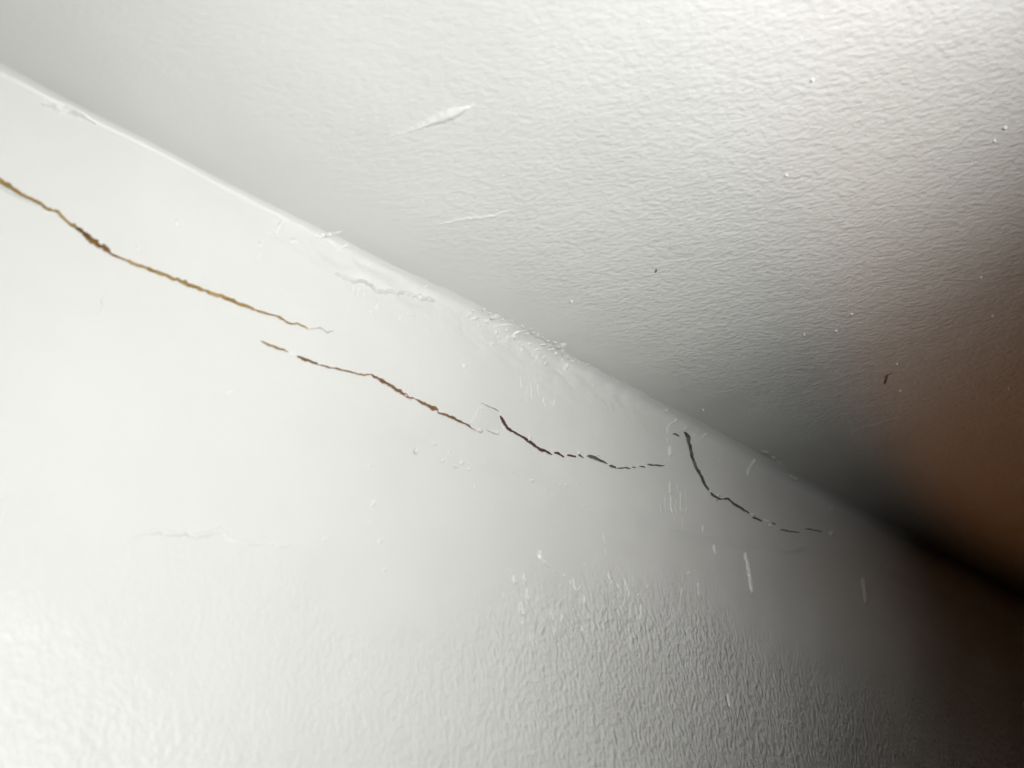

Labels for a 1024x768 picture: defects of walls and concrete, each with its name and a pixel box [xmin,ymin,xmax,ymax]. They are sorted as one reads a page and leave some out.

crack [0,178,331,333]
crack [261,341,665,469]
crack [673,432,834,537]